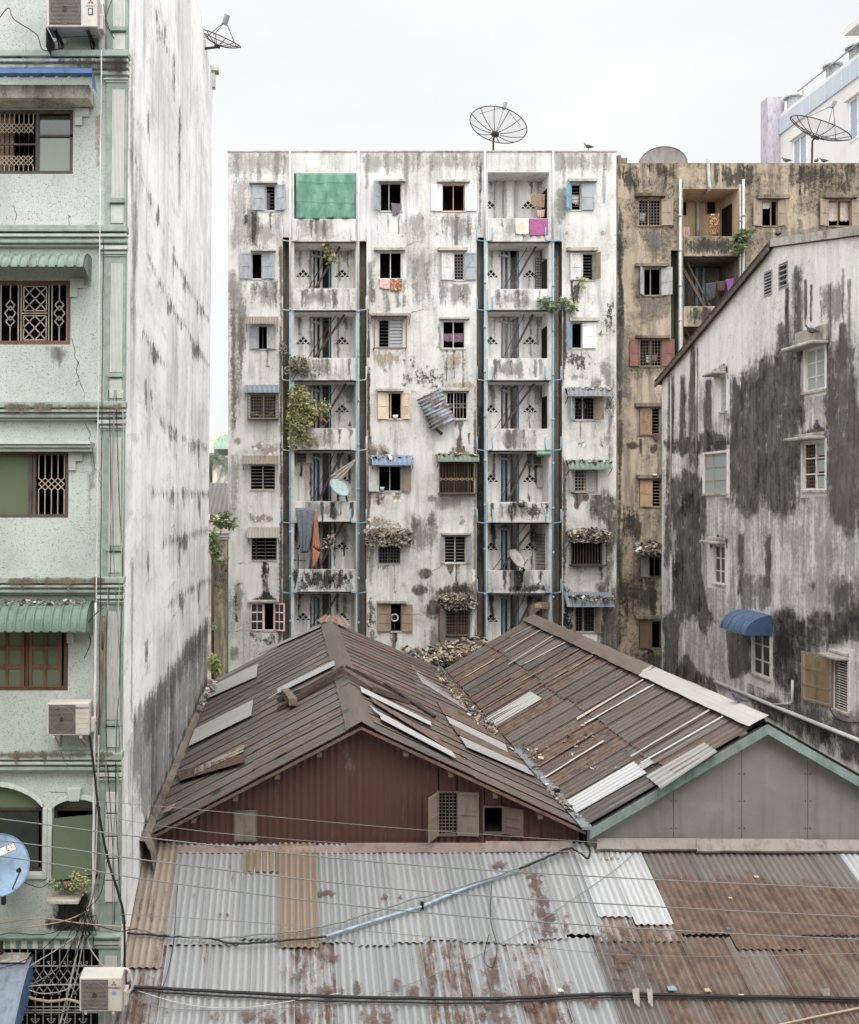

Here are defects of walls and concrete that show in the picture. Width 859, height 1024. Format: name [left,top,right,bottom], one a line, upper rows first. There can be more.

damp [618,164,677,192]
damp [262,246,354,628]
damp [562,206,859,693]
damp [141,679,207,846]
rust [526,870,570,936]
rust [239,951,361,1024]
rust [360,1005,398,1024]
rust [393,975,437,996]